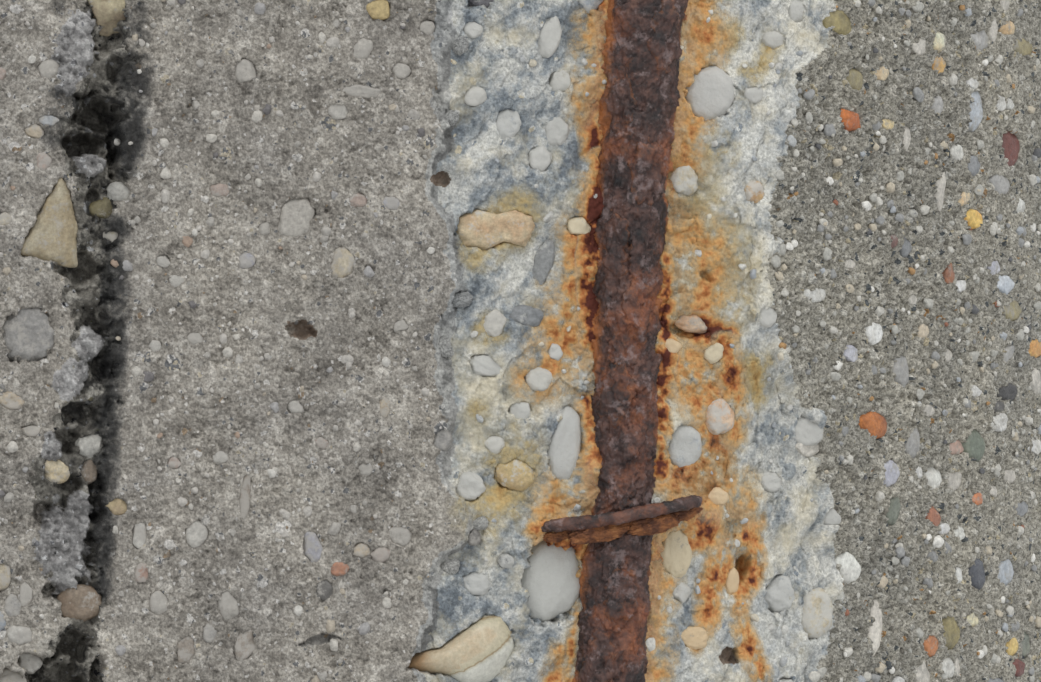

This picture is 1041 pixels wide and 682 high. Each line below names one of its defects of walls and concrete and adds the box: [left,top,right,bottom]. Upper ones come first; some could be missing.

crack [25,0,140,682]
spalling [410,0,846,682]
rust [511,0,771,682]